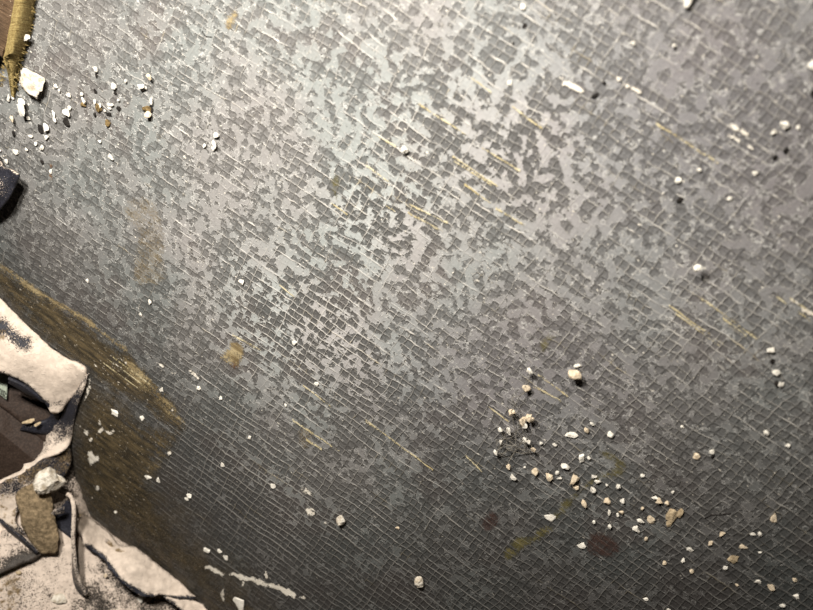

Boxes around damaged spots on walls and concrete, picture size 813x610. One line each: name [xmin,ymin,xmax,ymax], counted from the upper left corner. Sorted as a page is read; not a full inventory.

peeling [80,420,114,466]
leakage [0,265,249,610]
peeling [205,565,305,599]